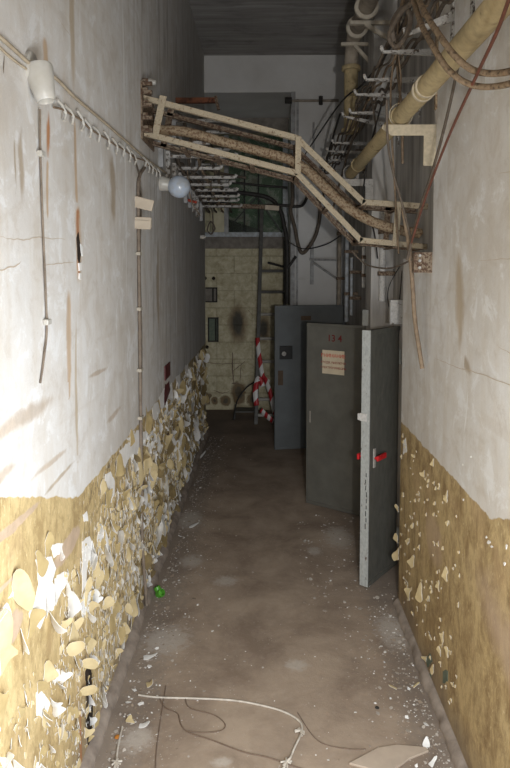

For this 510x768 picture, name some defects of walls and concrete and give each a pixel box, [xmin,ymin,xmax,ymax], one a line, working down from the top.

rust [65,118,84,497]
peeling [0,348,245,768]
peeling [342,606,457,768]